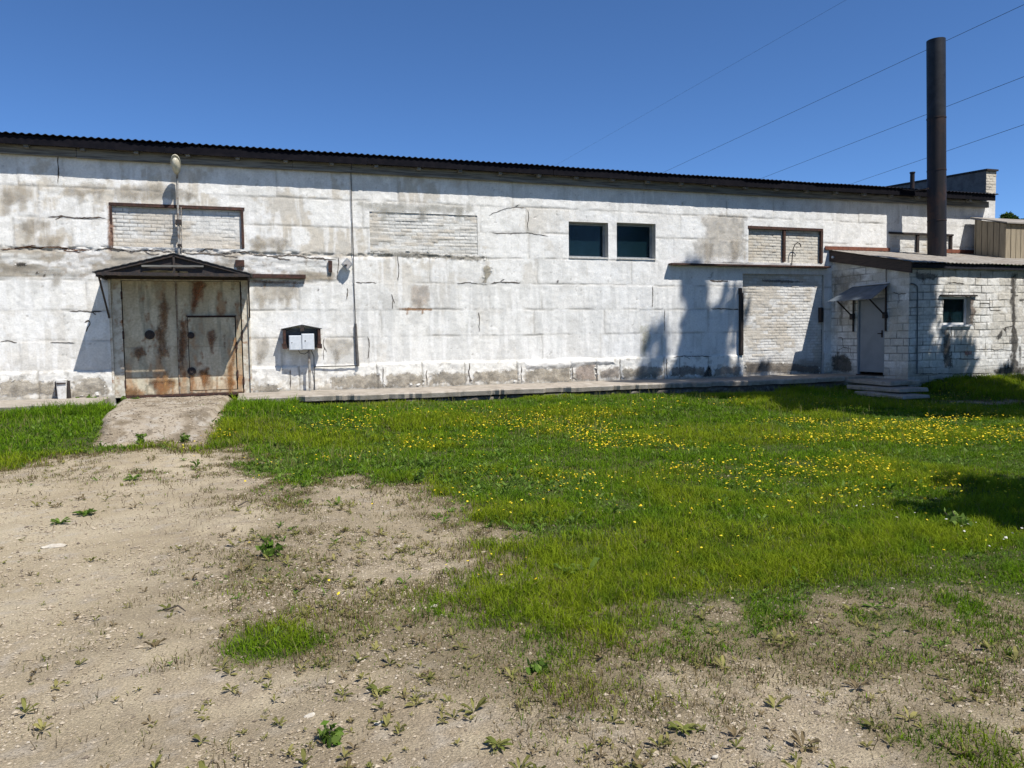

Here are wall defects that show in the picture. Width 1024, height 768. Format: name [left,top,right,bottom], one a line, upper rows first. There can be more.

crack [51,213,102,221]
crack [489,204,545,236]
rust [193,281,205,307]
crack [3,245,399,308]
rust [115,295,188,395]
rust [208,330,236,392]